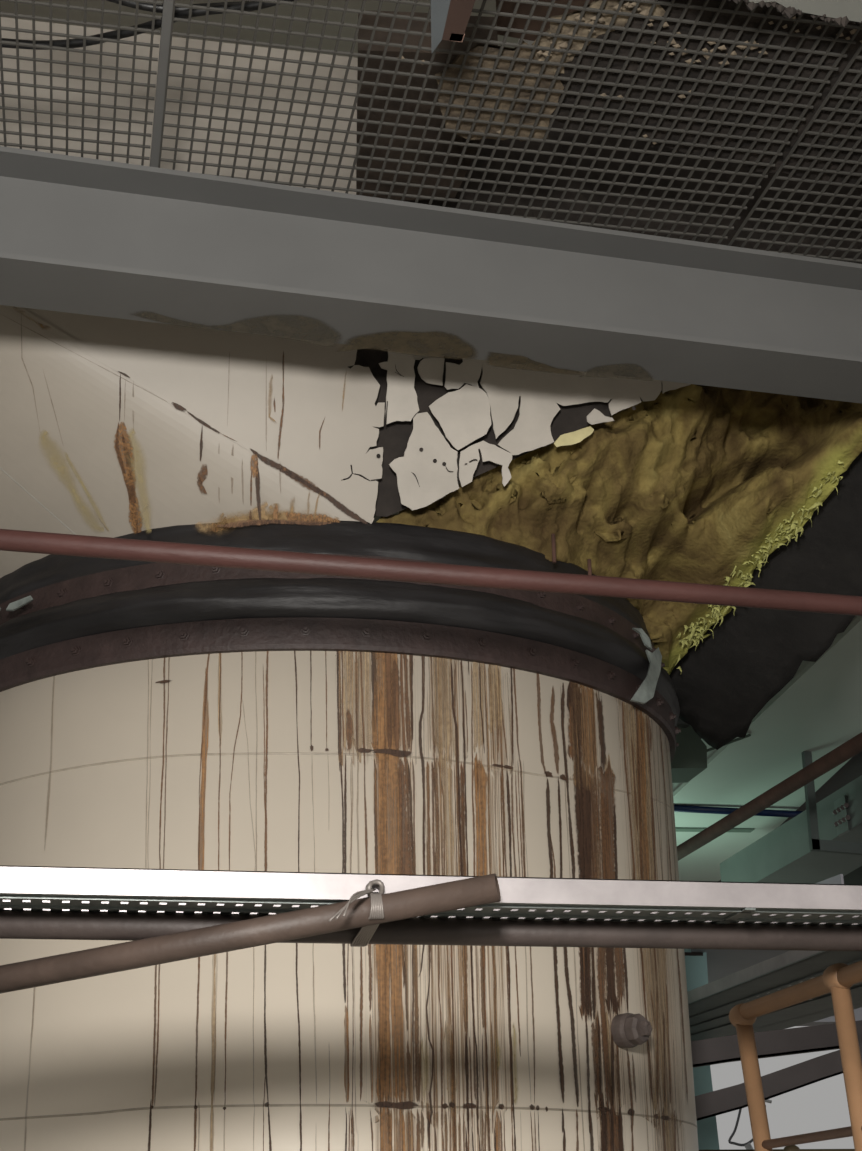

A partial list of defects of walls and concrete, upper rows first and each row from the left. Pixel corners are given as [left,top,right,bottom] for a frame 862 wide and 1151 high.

corrosion [114,371,151,533]
corrosion [196,352,368,532]
crack [343,465,378,481]
peeling [379,351,691,510]
corrosion [294,650,526,877]
corrosion [537,673,672,880]
corrosion [342,944,548,1151]
corrosion [553,947,688,1151]